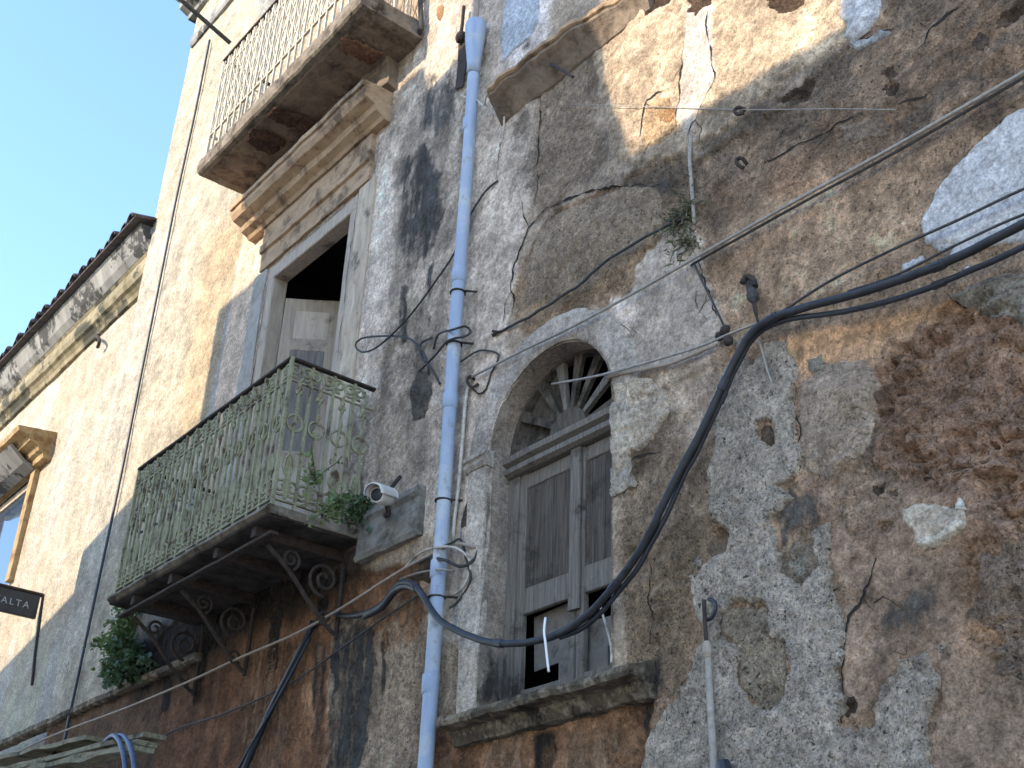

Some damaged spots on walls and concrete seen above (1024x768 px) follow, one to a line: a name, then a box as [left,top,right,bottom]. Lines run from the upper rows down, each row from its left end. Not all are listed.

flaking render [245,107,316,155]
damp [401,144,444,296]
crack [503,100,660,321]
crack [640,7,718,138]
crack [761,113,860,164]
damp [399,286,407,343]
spalling [872,273,1024,683]
peeling [641,341,950,768]
damp [312,625,387,768]
crack [833,558,904,723]